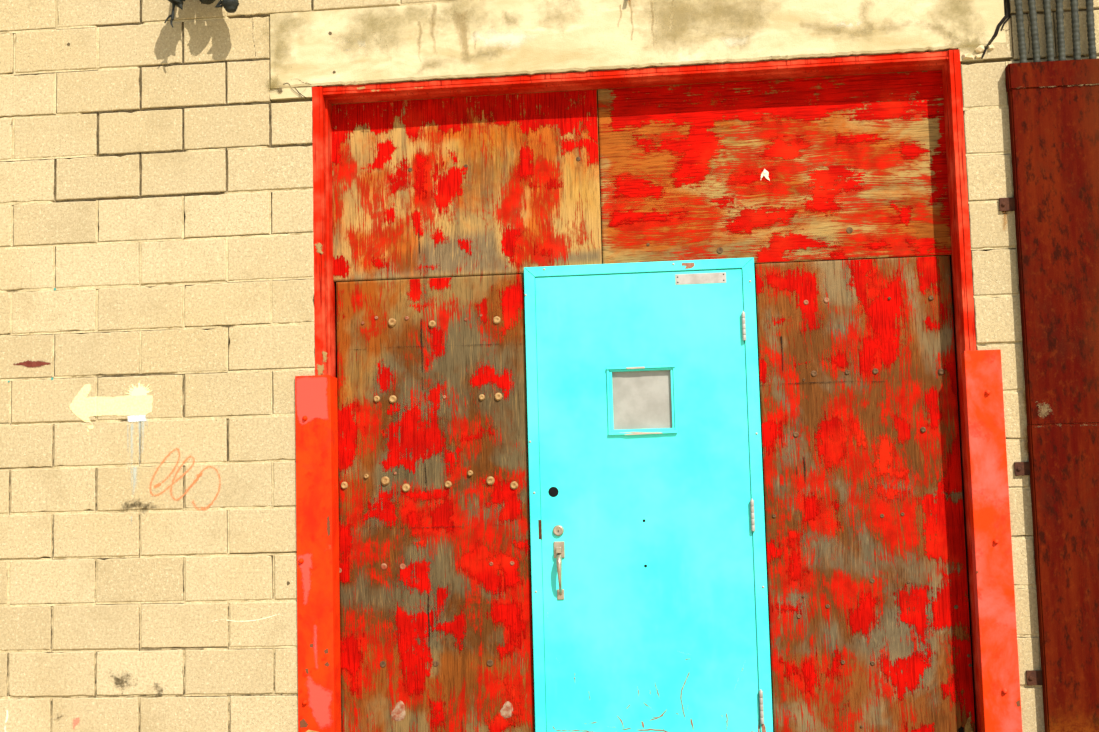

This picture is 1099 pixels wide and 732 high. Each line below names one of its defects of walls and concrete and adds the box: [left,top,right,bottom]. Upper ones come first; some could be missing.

peeling [332,70,952,379]
peeling [315,243,351,278]
peeling [470,358,518,402]
peeling [759,358,769,384]
peeling [923,361,957,429]
peeling [762,420,791,457]
peeling [482,470,522,523]
peeling [327,357,494,732]
peeling [458,539,530,660]
peeling [767,492,842,586]
peeling [814,411,978,726]
peeling [485,677,521,732]